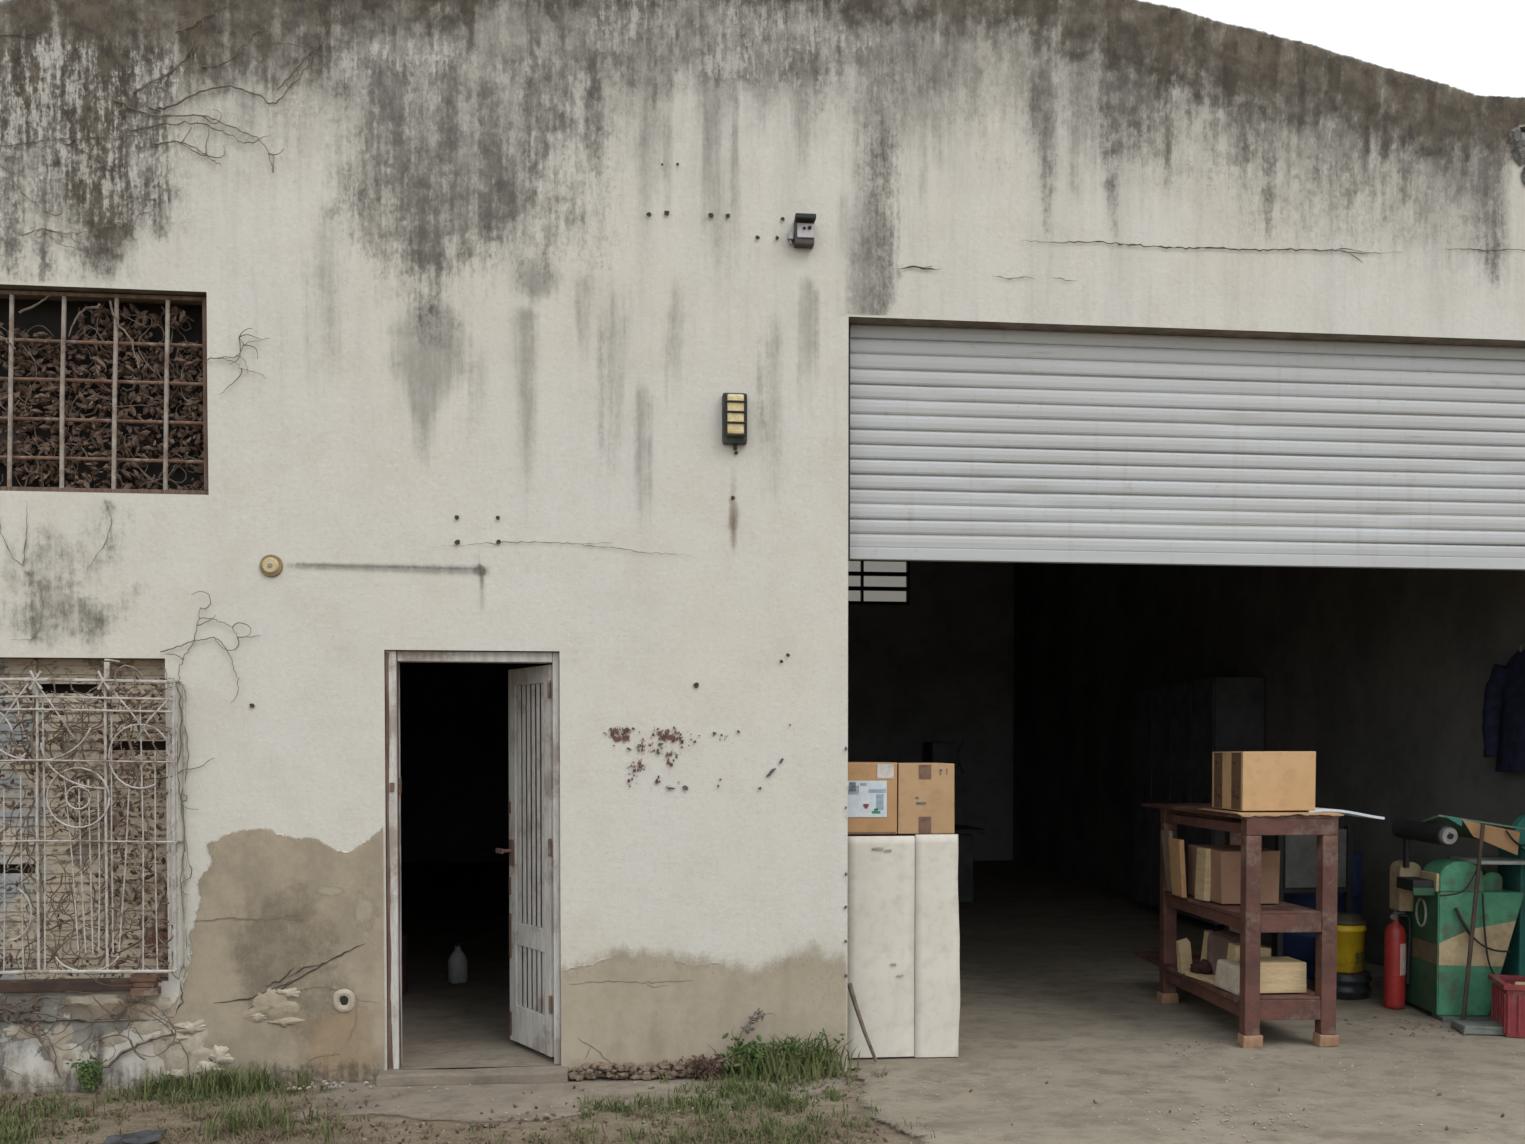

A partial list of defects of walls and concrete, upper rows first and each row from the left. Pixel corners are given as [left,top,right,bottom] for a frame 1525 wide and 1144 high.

water stain [0,0,1525,315]
crack [995,240,1401,281]
water stain [27,572,102,638]
crack [0,943,379,1076]
flaking render [0,827,385,1087]
flaking render [561,940,847,1072]